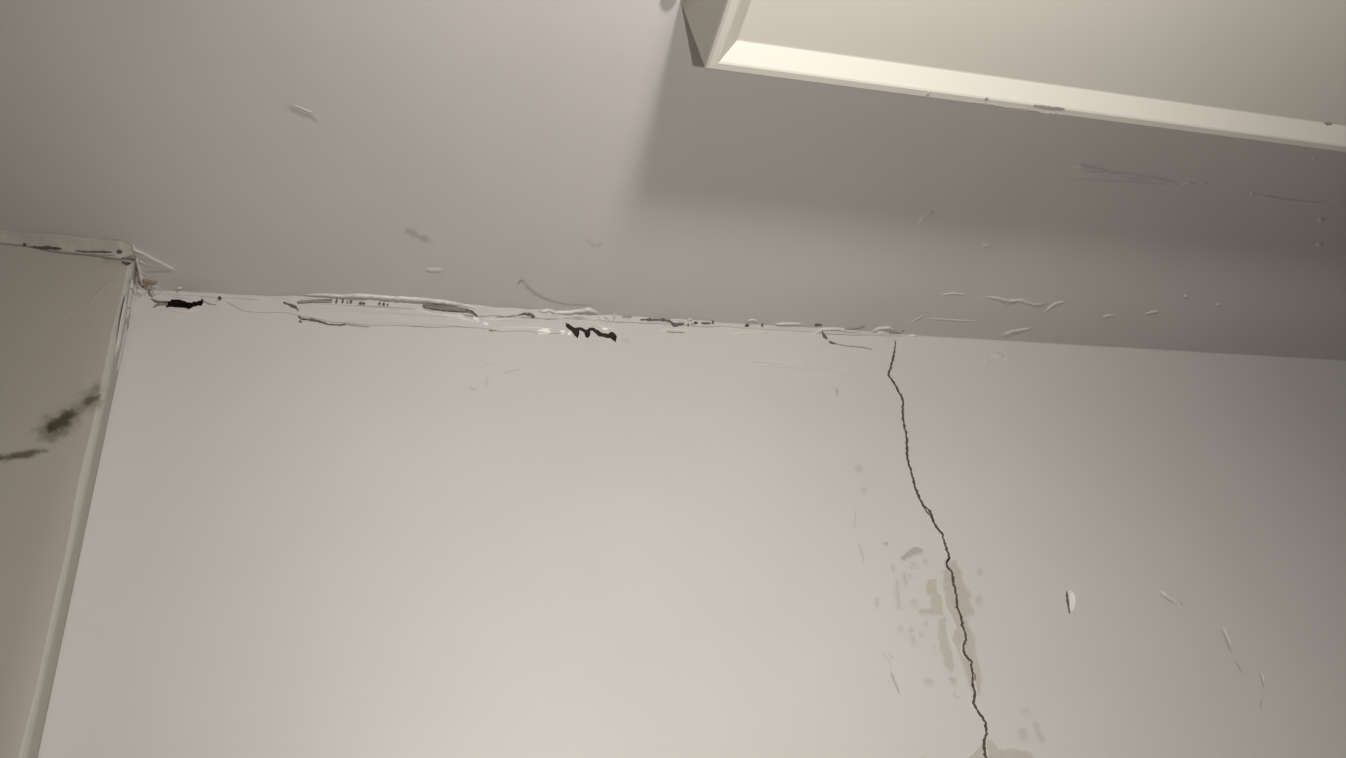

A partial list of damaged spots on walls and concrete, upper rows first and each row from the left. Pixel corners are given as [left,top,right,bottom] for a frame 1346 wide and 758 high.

crack [283,299,389,327]
crack [517,276,714,333]
water stain [47,412,73,432]
water stain [0,450,35,459]
crack [810,324,989,758]
peeling [968,737,1035,758]